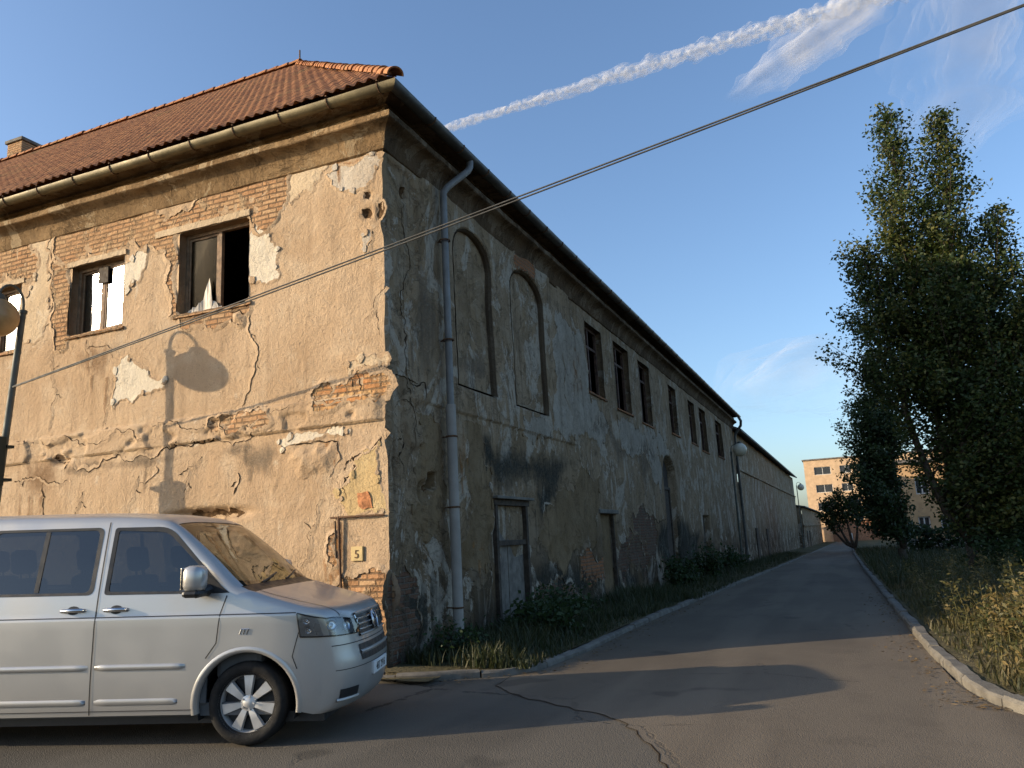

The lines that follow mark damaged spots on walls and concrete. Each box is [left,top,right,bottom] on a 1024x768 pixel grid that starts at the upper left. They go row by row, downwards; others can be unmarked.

flaking render [0,151,387,354]
peeling [110,353,168,410]
crack [14,201,418,515]
flaking render [205,351,398,454]
flaking render [323,428,423,668]
leakage [484,437,563,514]